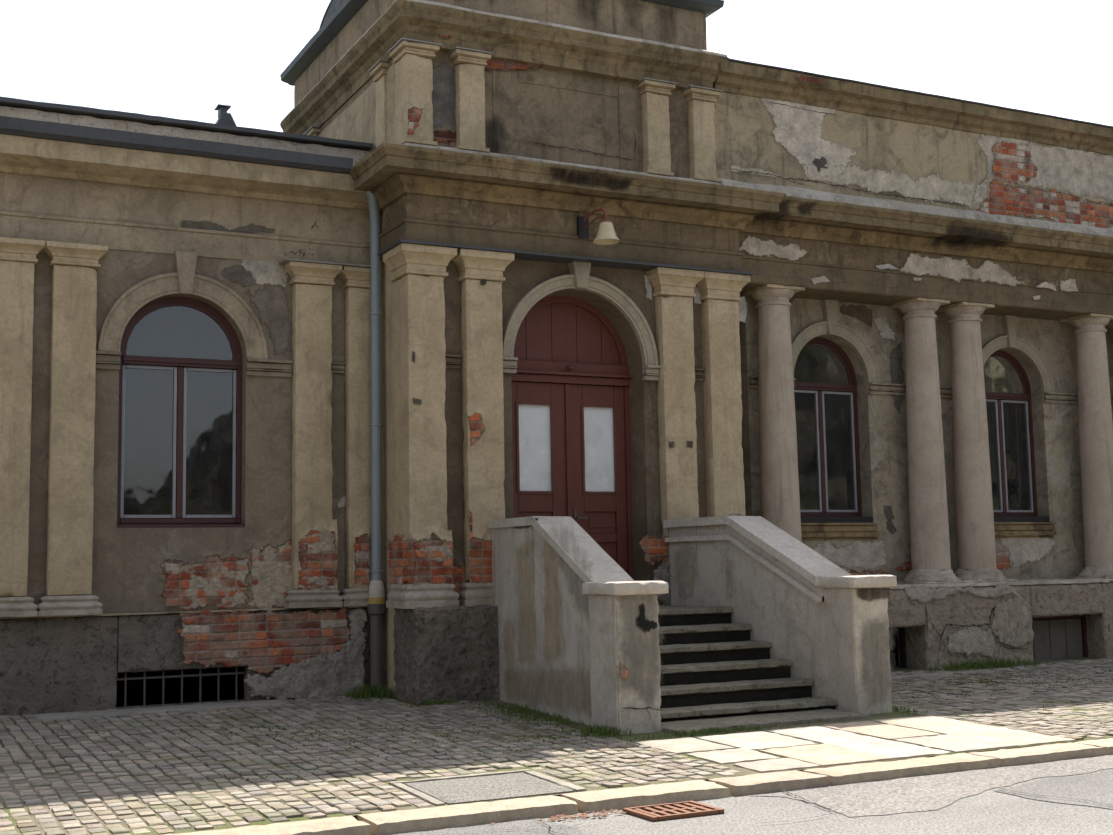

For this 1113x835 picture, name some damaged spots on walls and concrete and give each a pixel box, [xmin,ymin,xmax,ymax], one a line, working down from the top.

spalling [406,62,456,148]
flaking render [731,97,1113,228]
peeling [739,235,807,261]
peeling [876,253,1024,286]
peeling [1033,278,1078,300]
flaking render [467,401,485,460]
flaking render [388,510,493,599]
flaking render [639,535,671,605]
flaking render [147,517,370,701]